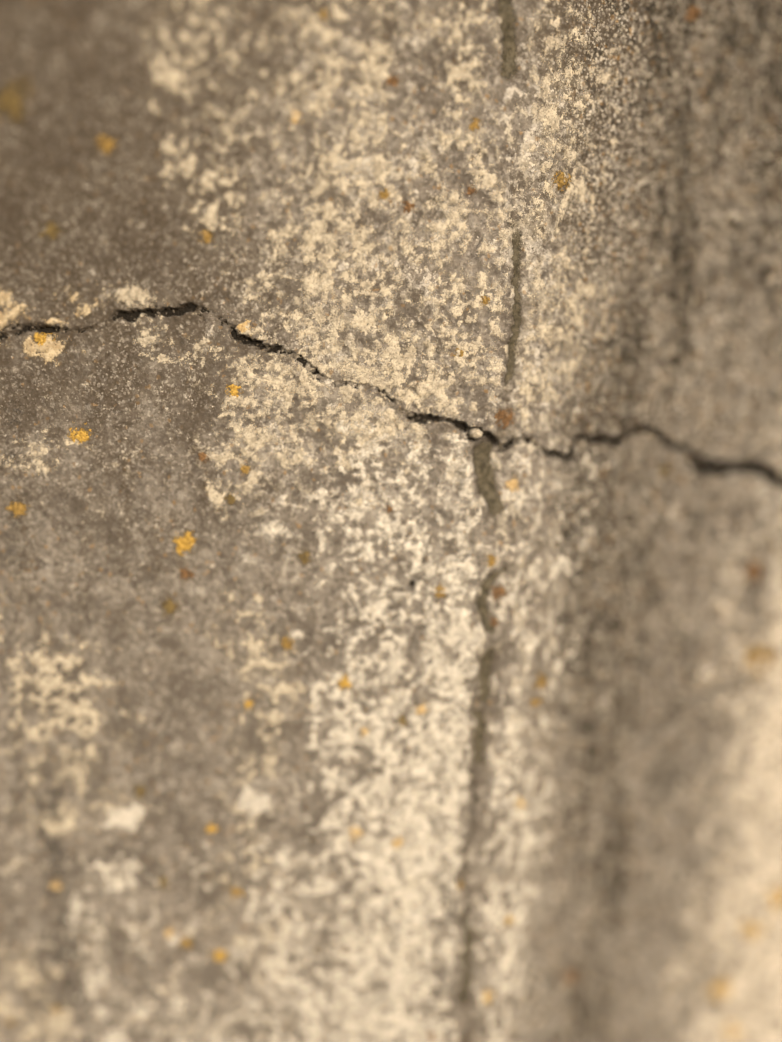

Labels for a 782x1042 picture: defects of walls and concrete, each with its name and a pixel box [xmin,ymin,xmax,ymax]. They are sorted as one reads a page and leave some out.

crack [0,304,782,489]
crack [462,769,477,865]